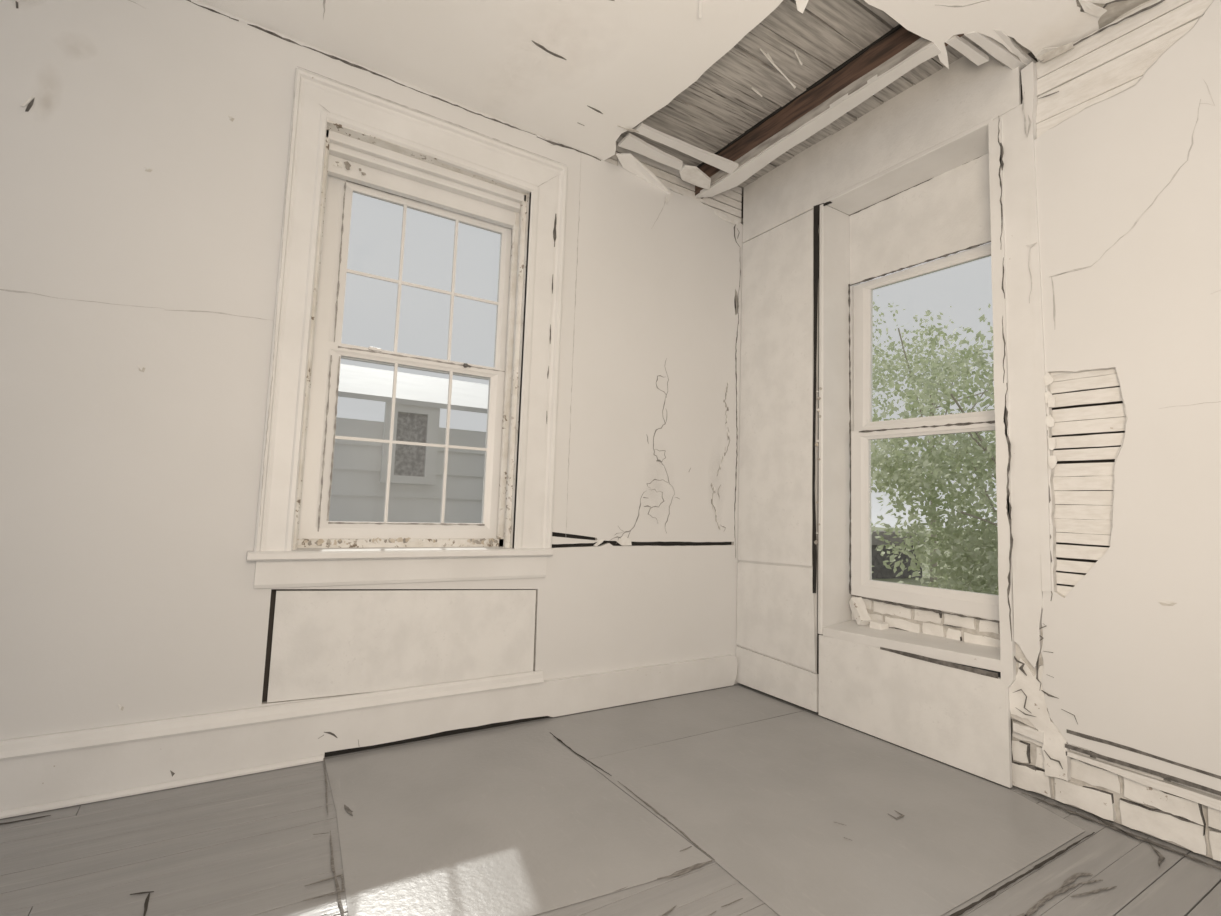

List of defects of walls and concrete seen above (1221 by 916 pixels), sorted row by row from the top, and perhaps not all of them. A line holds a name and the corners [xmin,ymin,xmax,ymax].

peeling [796,0,809,13]
flaking render [1035,0,1214,138]
flaking render [605,136,742,226]
crack [0,0,741,557]
crack [812,201,832,593]
crack [880,79,1221,796]
flaking render [1043,367,1128,600]
flaking render [849,596,1000,648]
crack [950,793,1221,916]
flaking render [1011,717,1221,862]